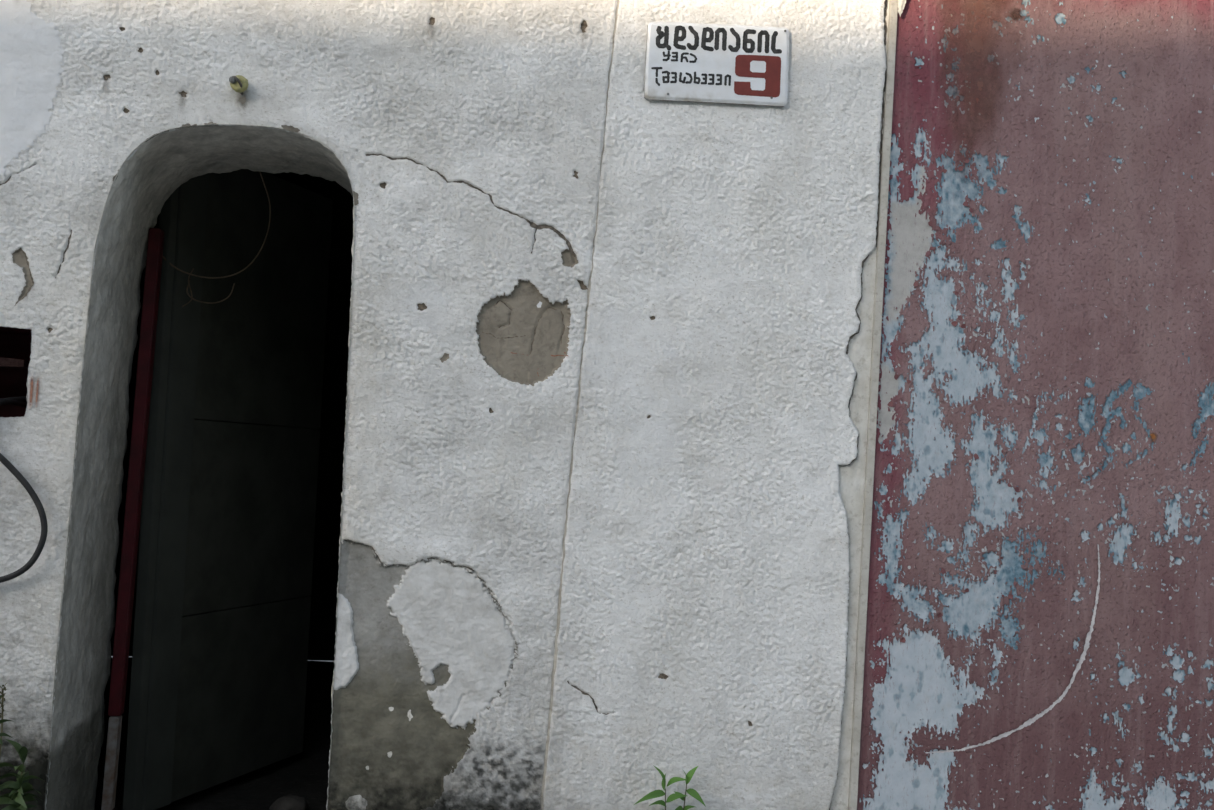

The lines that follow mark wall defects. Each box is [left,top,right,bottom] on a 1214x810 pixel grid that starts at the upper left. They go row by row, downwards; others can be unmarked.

crack [55,230,72,278]
flaking render [561,249,588,290]
flaking render [476,279,571,386]
crack [366,0,619,810]
peeling [829,0,1214,810]
flaking render [328,539,518,810]
damp [328,749,541,810]